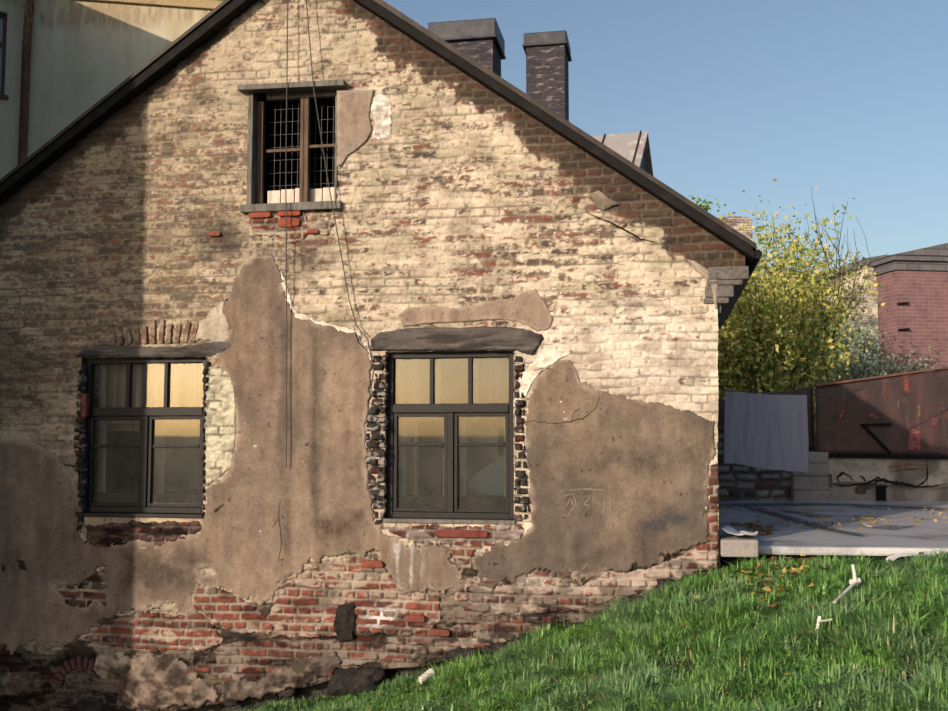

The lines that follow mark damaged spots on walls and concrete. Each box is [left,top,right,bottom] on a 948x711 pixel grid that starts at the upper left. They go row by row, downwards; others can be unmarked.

peeling [336,90,393,167]
crack [585,212,657,243]
peeling [0,254,720,682]
crack [828,458,947,488]
water stain [394,543,414,582]